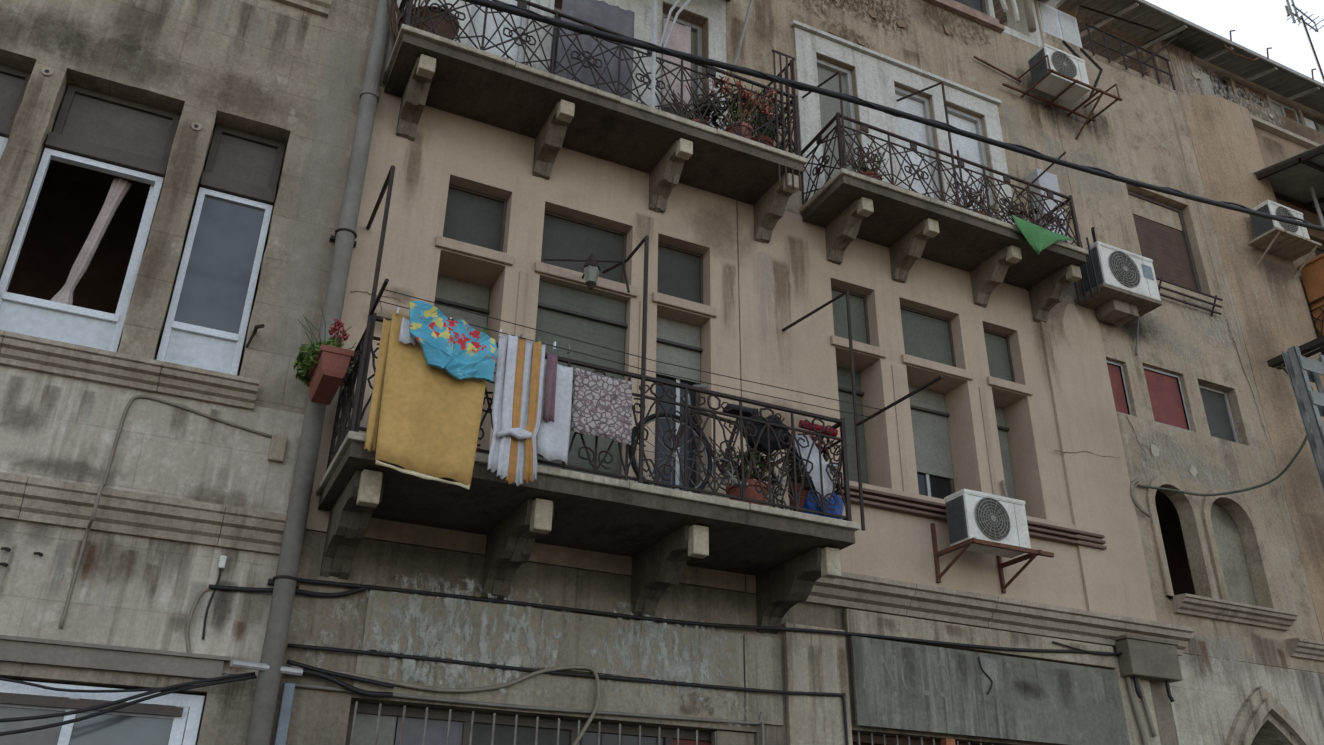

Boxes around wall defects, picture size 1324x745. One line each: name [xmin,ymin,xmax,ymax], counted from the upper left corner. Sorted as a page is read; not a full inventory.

spalling [792,0,987,45]
peeling [361,578,567,693]
peeling [591,605,747,720]